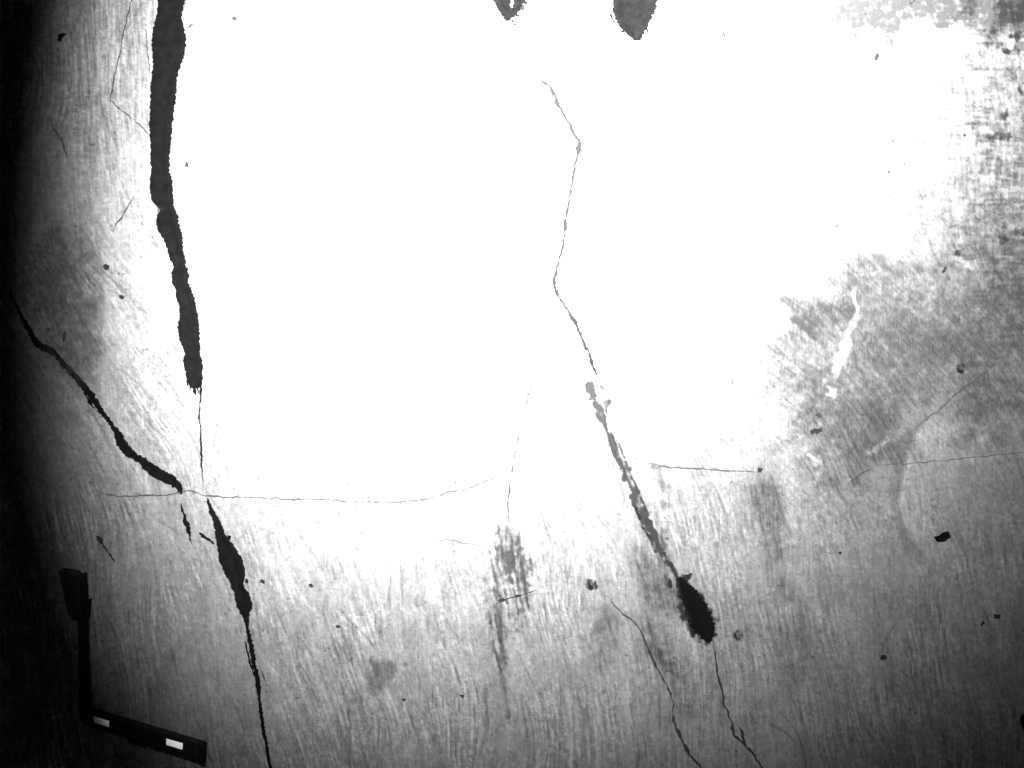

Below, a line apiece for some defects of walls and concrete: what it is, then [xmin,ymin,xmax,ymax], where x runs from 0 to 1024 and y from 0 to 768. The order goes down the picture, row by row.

crack [9,0,535,768]
crack [539,79,754,588]
crack [609,598,701,768]
crack [713,644,763,768]